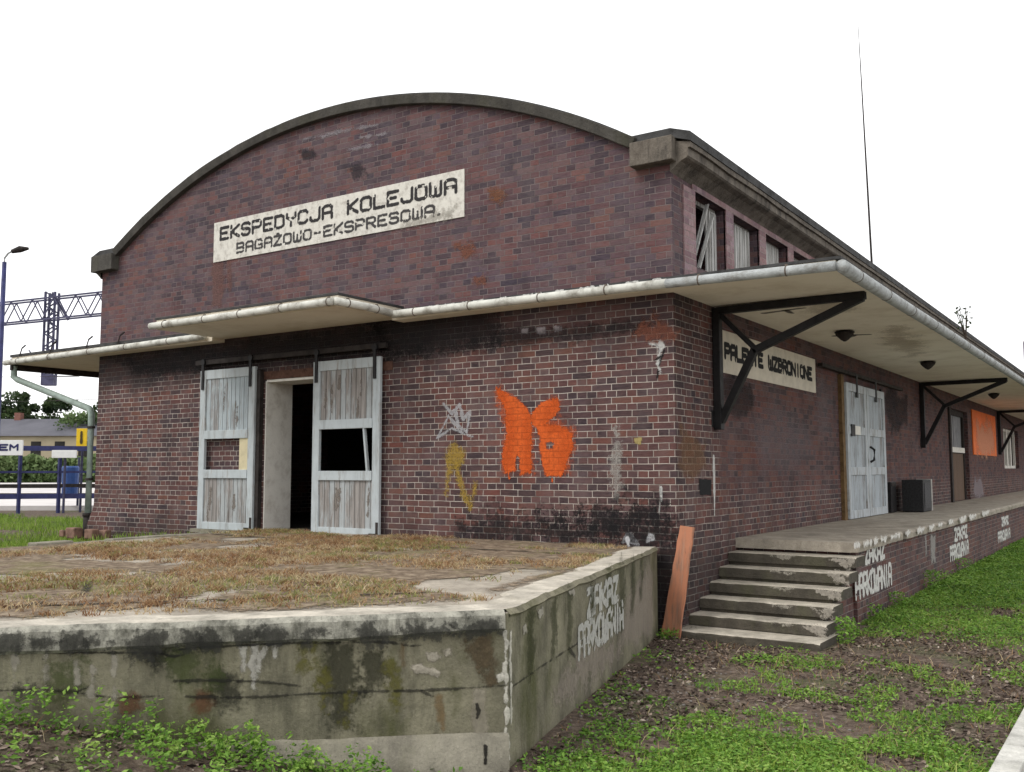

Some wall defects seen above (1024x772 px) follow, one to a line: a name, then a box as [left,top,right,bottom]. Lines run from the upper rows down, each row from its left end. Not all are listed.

spalling [803,510,989,638]
damp [0,611,504,733]
spalling [464,624,527,761]